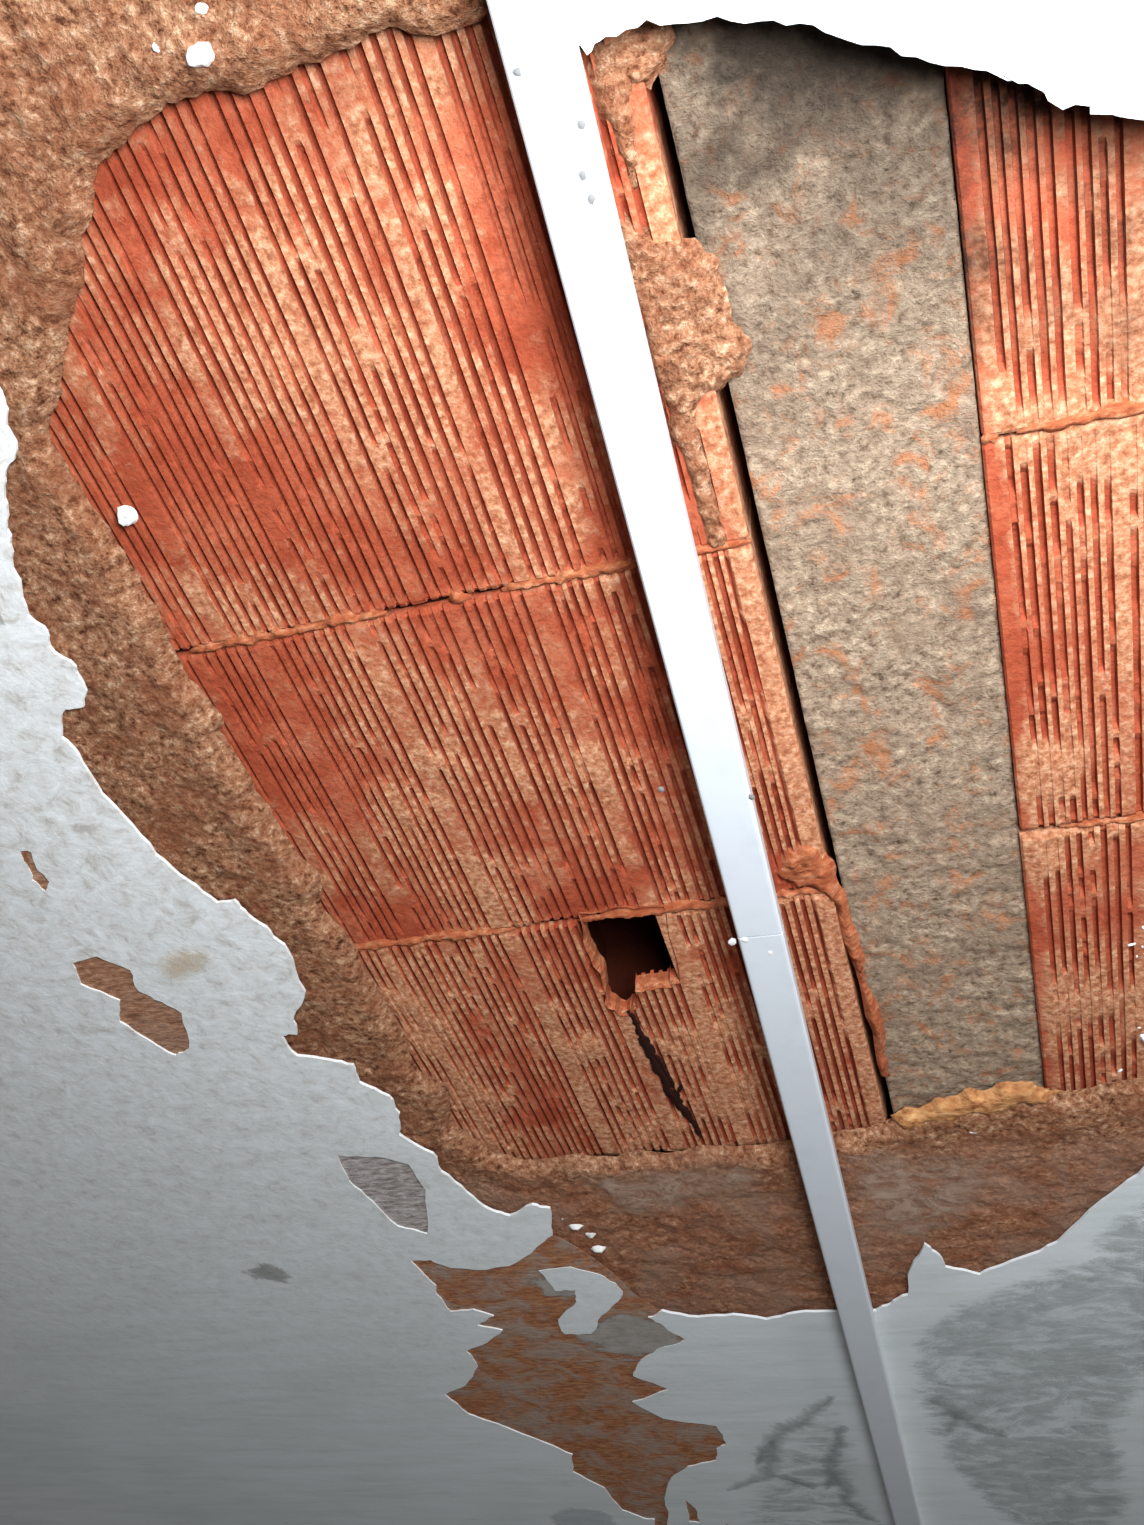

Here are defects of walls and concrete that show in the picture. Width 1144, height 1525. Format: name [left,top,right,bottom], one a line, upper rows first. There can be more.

peeling [1003,0,1144,118]
flaking render [0,0,837,1525]
crack [626,1010,702,1138]
flaking render [832,1078,1144,1309]
leakage [920,1222,1144,1525]